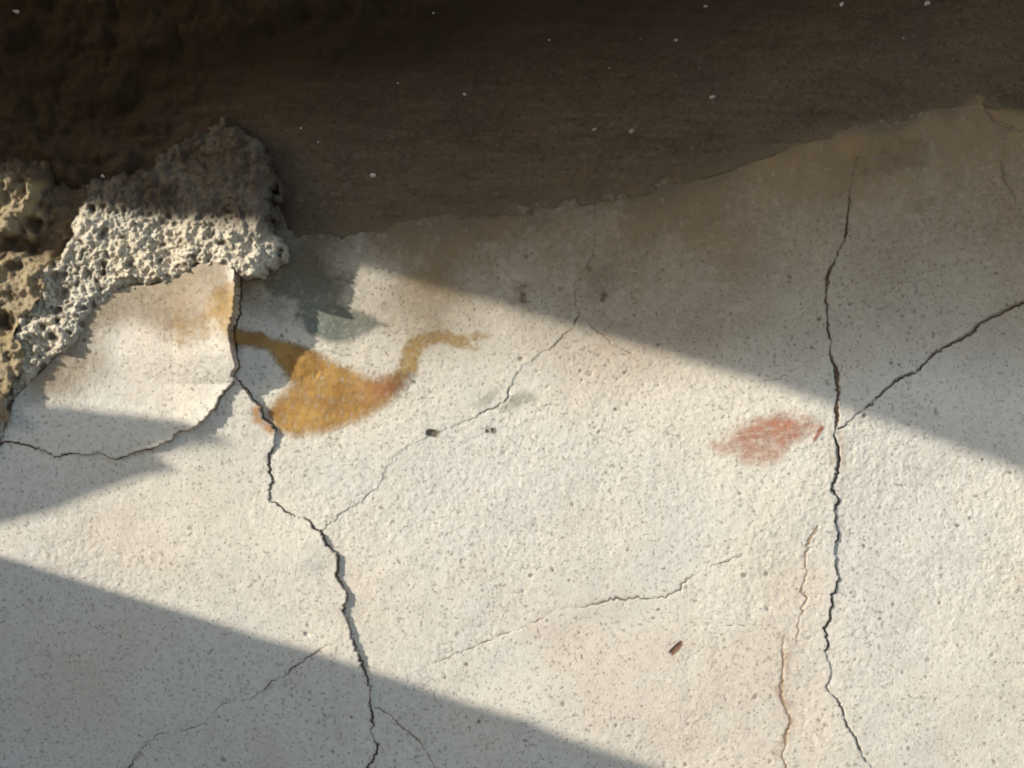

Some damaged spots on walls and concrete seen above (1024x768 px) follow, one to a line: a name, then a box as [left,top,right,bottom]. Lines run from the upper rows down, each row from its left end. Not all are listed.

spalling [0,117,289,445]
crack [0,441,80,457]
crack [128,646,326,768]
crack [215,281,436,768]
crack [406,553,744,668]
crack [764,196,1024,768]